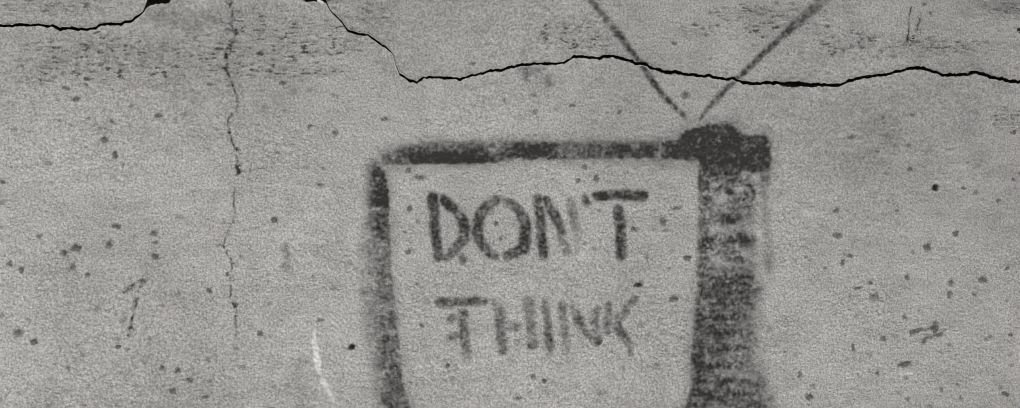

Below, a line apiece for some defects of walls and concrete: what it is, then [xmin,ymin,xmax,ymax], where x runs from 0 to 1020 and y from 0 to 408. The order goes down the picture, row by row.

crack [0,0,170,31]
crack [304,0,1020,87]
crack [224,4,241,174]